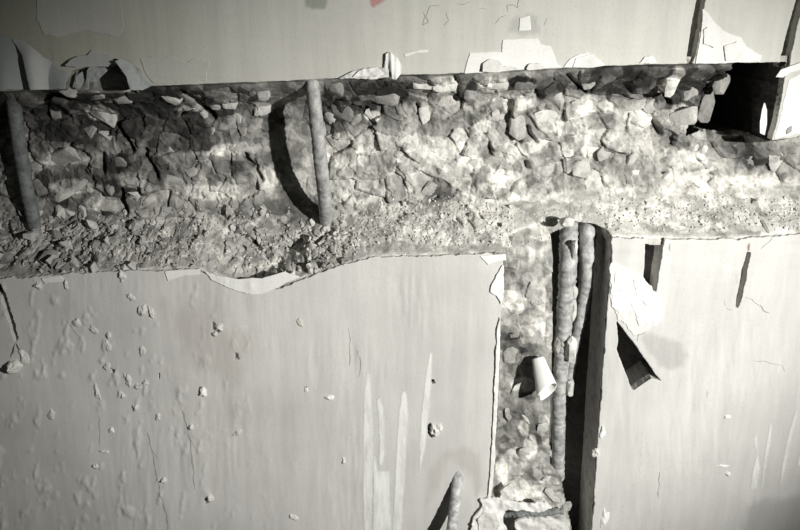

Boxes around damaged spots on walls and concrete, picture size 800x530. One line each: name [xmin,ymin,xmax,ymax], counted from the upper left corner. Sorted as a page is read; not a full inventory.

spalling [0,9,800,294]
damp [363,373,408,530]
damp [420,353,432,467]
spalling [480,236,572,530]
peeling [607,256,663,385]